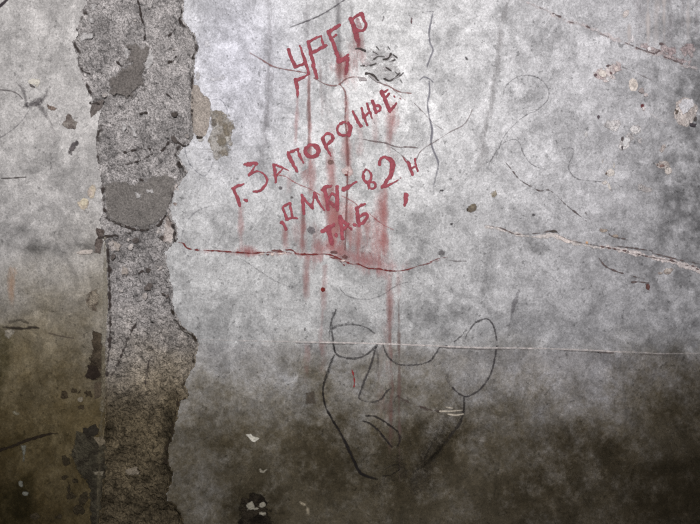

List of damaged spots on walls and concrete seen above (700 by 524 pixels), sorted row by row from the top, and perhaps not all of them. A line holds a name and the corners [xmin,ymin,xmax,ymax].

crack [552,13,697,69]
spalling [61,0,235,524]
crack [183,58,439,272]
crack [485,225,700,290]